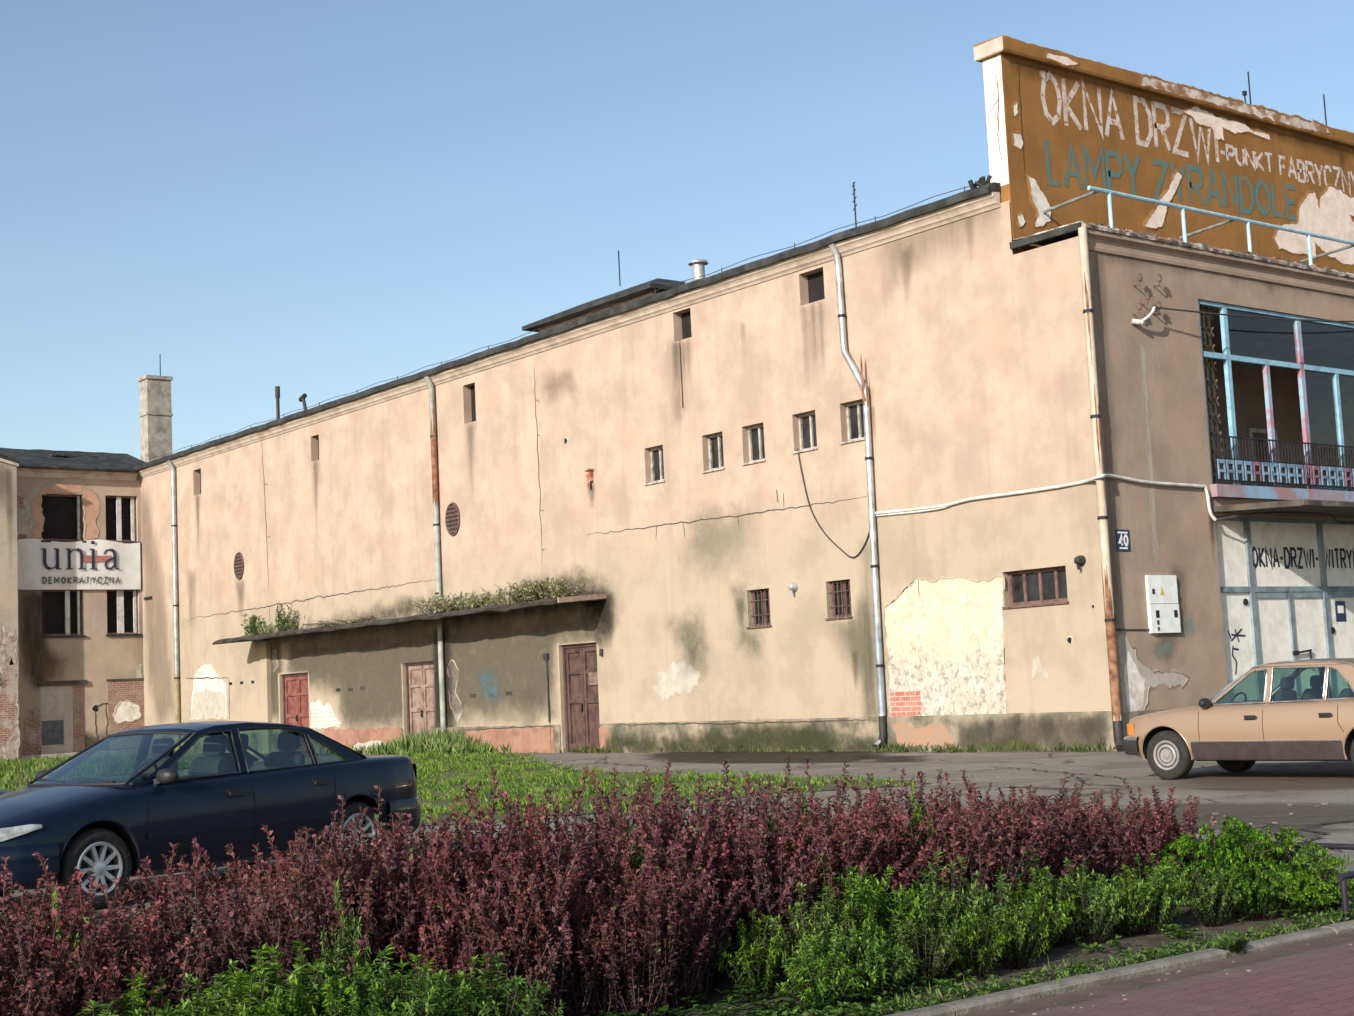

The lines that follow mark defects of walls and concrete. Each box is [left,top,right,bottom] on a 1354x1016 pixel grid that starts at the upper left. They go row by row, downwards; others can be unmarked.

peeling [1139,74,1331,143]
peeling [1016,174,1052,230]
peeling [1142,169,1182,231]
peeling [1272,183,1354,268]
corrosion [1084,272,1093,361]
corrosion [1094,386,1105,494]
flaking render [0,624,42,762]
flaking render [90,699,143,725]
flaking render [190,662,228,721]
flaking render [883,573,1009,747]
flaking render [1116,633,1189,712]